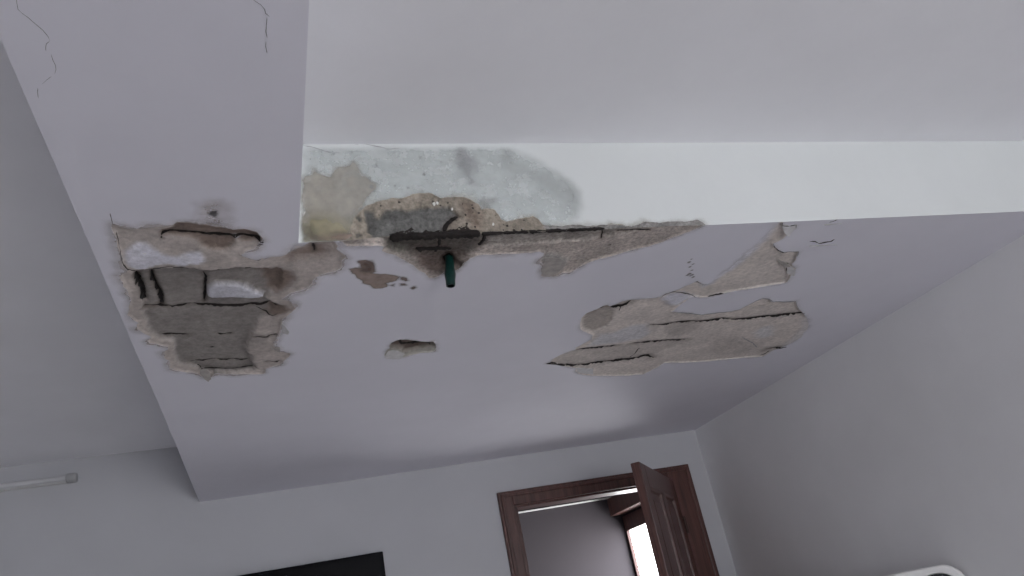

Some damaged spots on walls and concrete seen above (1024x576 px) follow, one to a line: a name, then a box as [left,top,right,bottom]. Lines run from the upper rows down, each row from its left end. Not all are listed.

crack [16,0,56,95]
damp [302,163,376,241]
spalling [110,193,705,382]
flaking render [546,222,809,376]